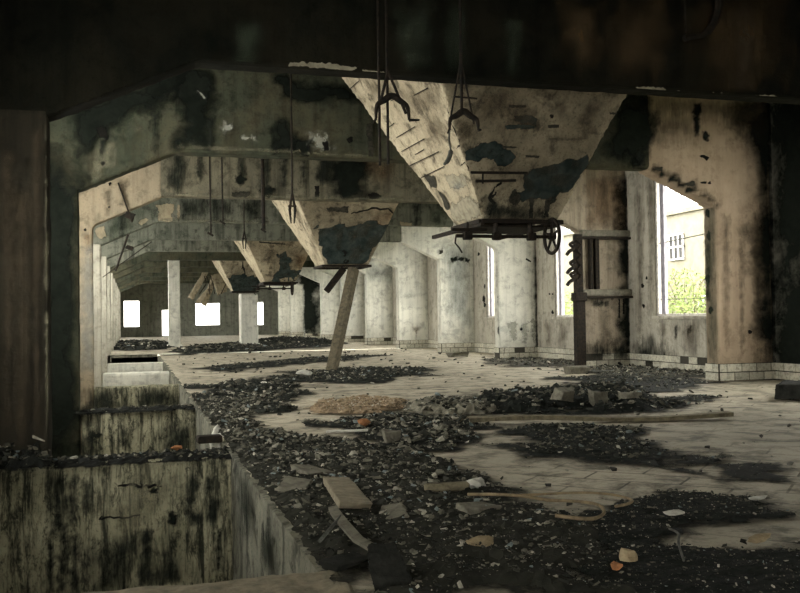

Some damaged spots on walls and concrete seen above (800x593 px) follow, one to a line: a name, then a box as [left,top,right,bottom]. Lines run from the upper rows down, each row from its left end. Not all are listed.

damp [235,158,247,185]
damp [259,159,288,198]
damp [316,161,388,199]
peeling [421,141,589,222]
peeling [314,186,397,264]
damp [186,477,220,525]
damp [46,475,180,593]